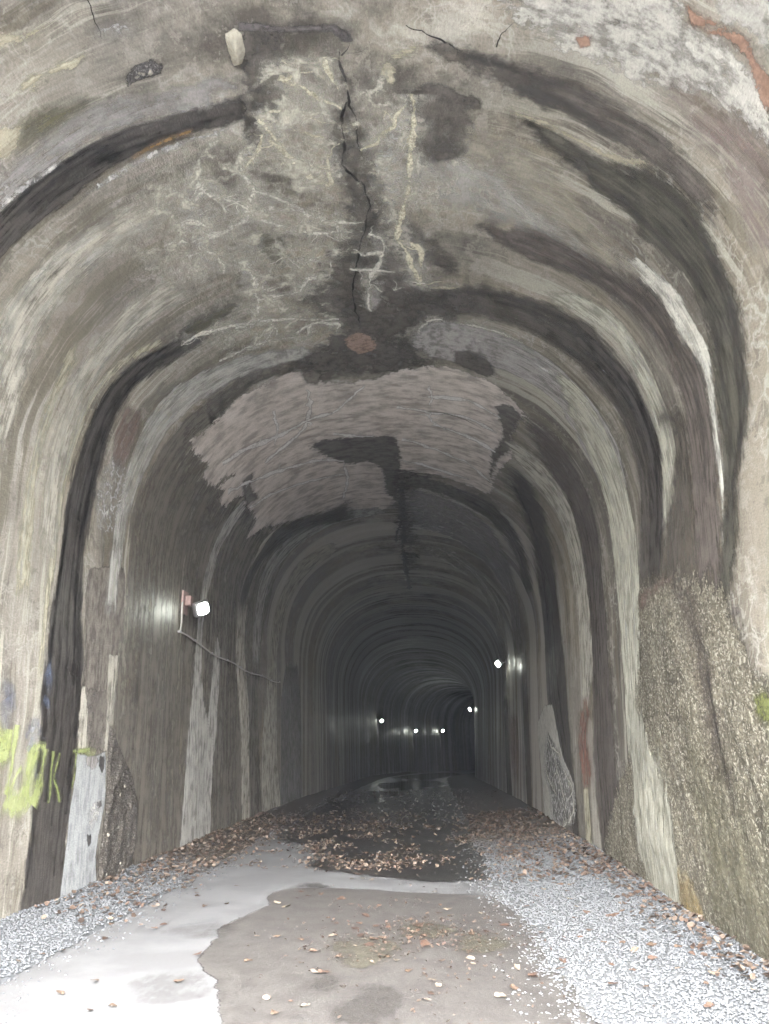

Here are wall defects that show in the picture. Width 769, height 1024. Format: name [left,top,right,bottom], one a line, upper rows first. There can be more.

spalling [126,59,163,87]
water stain [359,46,418,111]
crack [406,25,467,52]
rust [576,35,591,48]
rust [686,6,769,112]
crack [164,47,457,362]
water stain [217,200,313,350]
peeling [189,365,527,538]
peeling [60,566,138,897]
peeling [537,704,577,833]
spalling [604,564,769,960]